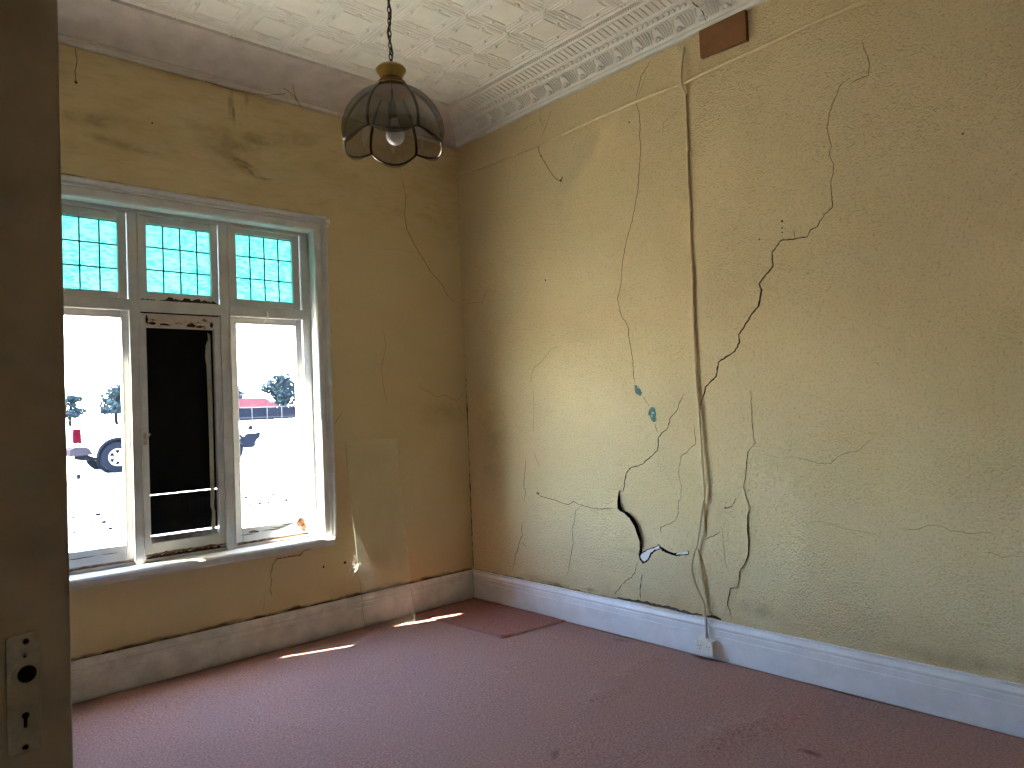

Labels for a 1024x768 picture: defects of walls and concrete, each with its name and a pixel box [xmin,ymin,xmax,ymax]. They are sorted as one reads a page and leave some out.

crack [523,40,870,574]
crack [705,390,869,620]
spalling [638,544,689,564]
crack [908,525,1019,558]
crack [613,563,642,599]